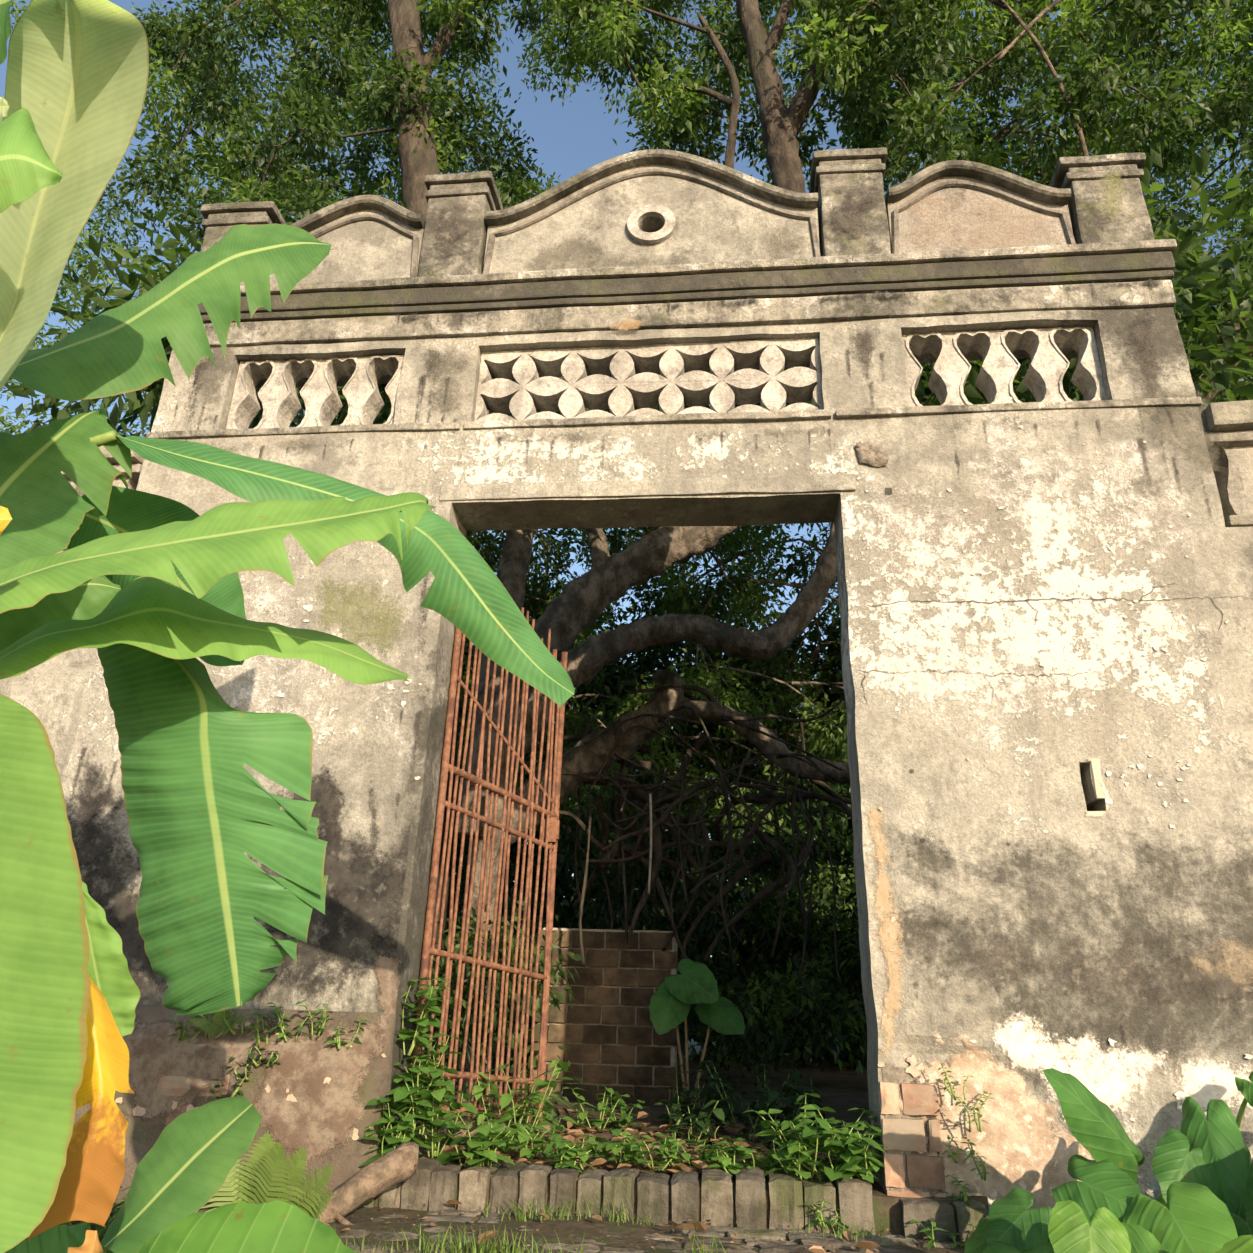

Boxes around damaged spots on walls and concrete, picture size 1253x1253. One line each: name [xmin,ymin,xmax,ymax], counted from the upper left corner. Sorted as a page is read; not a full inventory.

spalling [855,441,983,580]
peeling [969,412,1194,557]
peeling [887,624,1085,760]
leakage [67,748,166,1000]
leakage [264,769,411,996]
leakage [897,908,949,963]
flaking render [868,806,1168,1211]
leakage [956,922,1253,1010]
peeling [1174,1054,1253,1117]